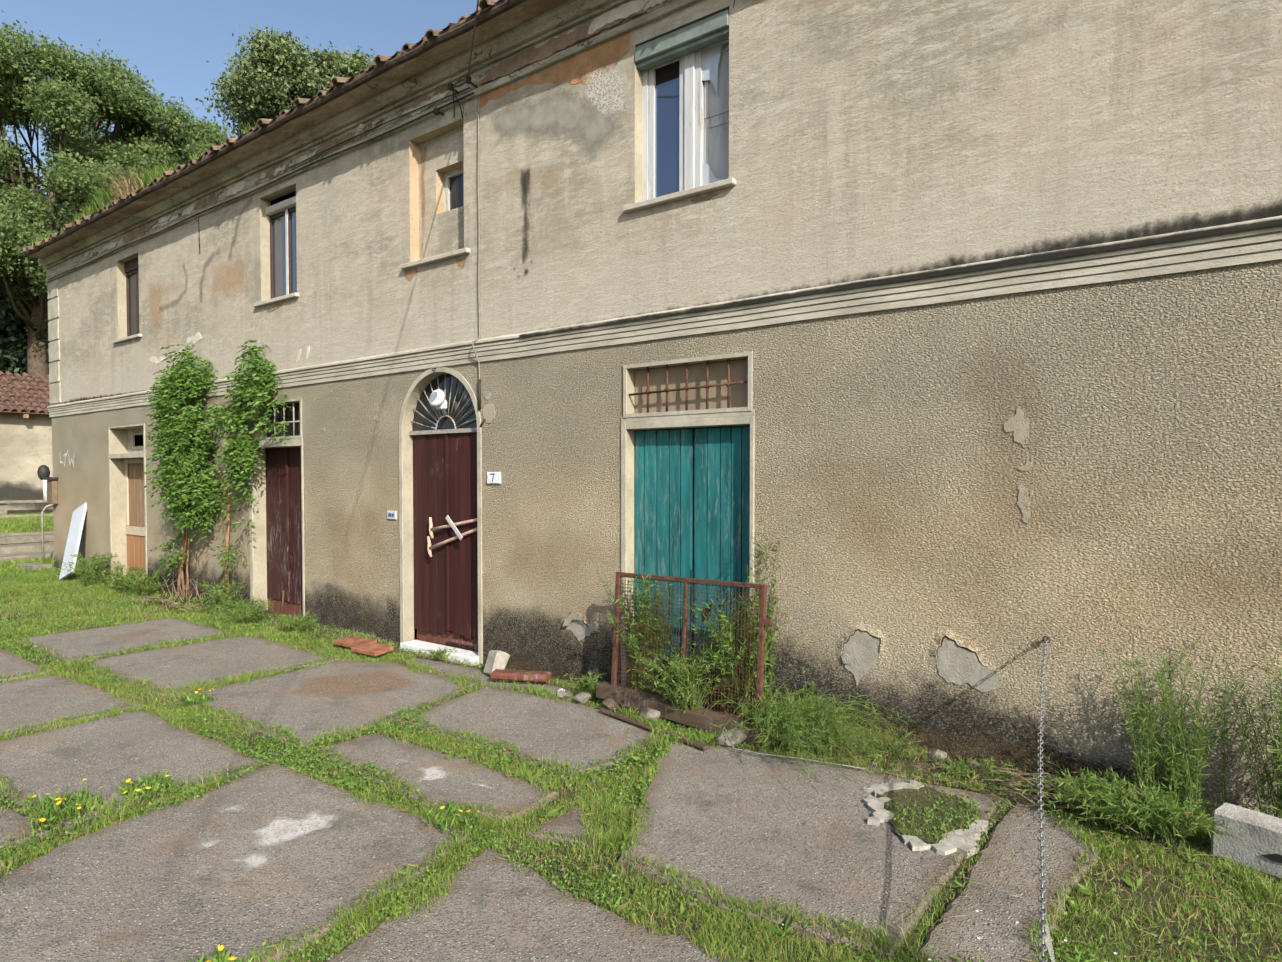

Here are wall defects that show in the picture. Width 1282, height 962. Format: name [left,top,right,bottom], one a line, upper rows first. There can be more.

peeling [479,0,672,116]
crack [74,110,406,263]
peeling [103,78,465,252]
damp [521,170,530,274]
damp [834,203,1282,284]
peeling [1003,408,1031,524]
damp [305,584,400,645]
damp [483,610,621,685]
spalling [562,609,601,644]
spalling [836,622,888,689]
damp [755,643,1068,773]
spalling [928,627,1007,696]